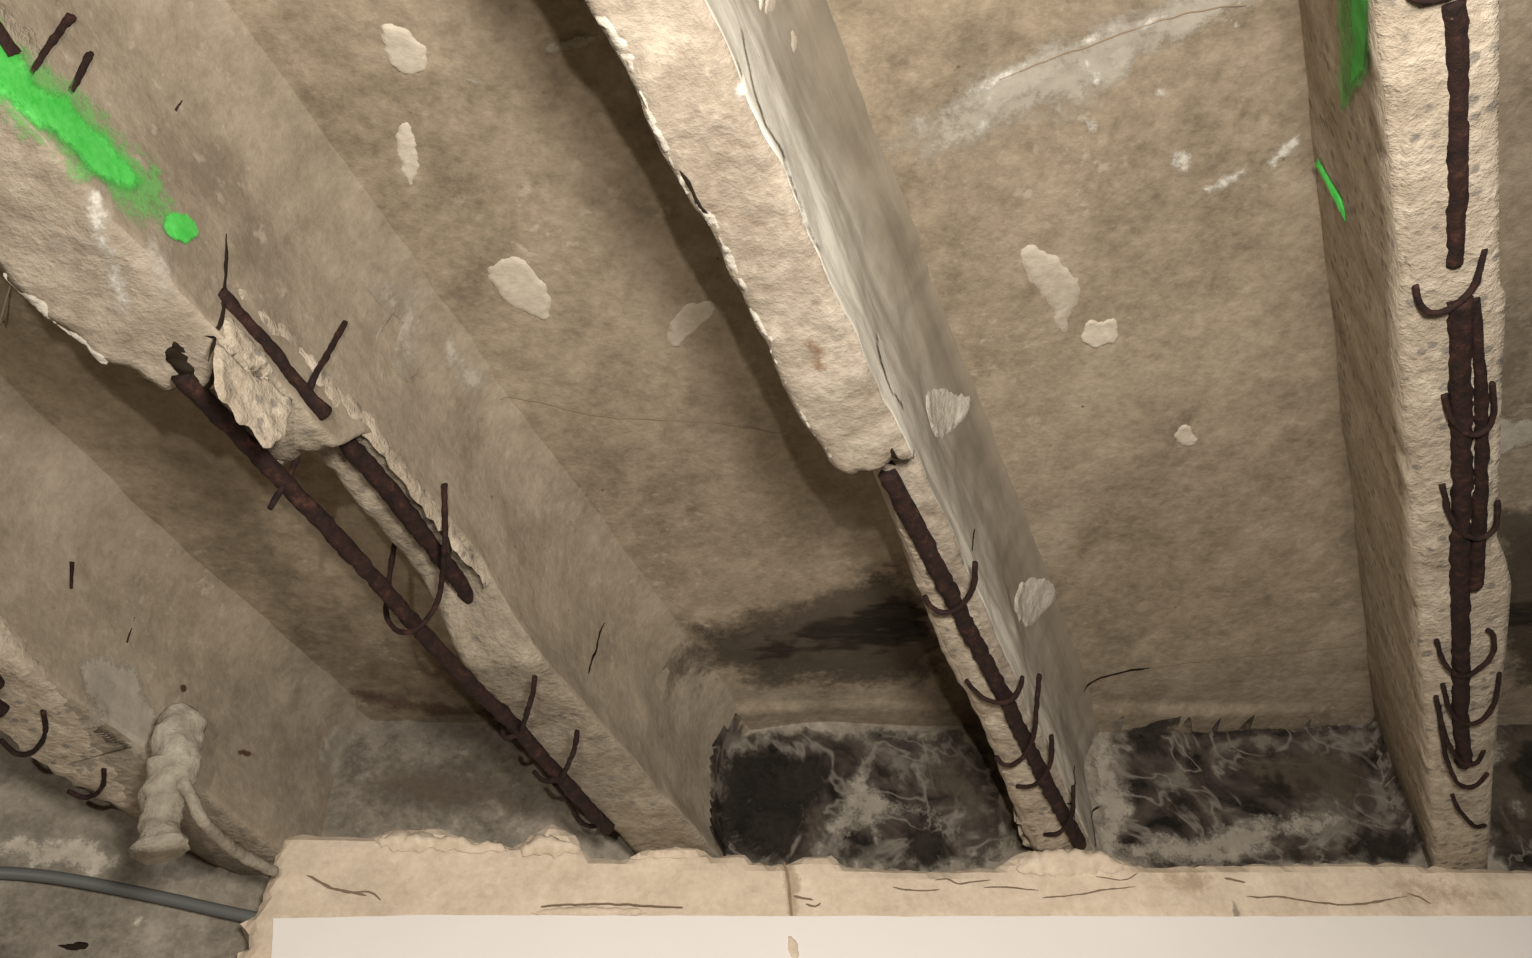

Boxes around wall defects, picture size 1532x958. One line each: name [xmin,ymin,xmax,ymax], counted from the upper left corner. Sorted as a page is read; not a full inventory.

spalling [546,15,634,71]
spalling [639,90,786,383]
peeling [1204,170,1244,192]
peeling [1270,136,1298,167]
spalling [3,273,108,365]
peeling [926,388,971,438]
spalling [0,615,131,808]
damp [668,576,940,687]
spalling [878,468,1087,852]
damp [710,713,1012,871]
damp [1094,714,1423,868]
damp [1489,724,1532,871]